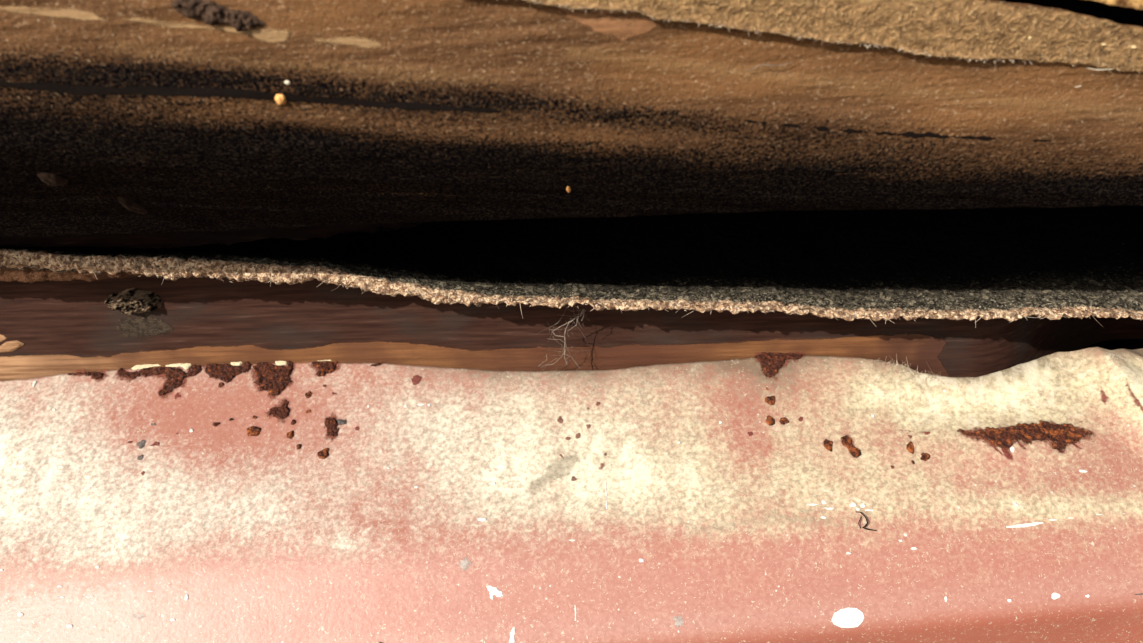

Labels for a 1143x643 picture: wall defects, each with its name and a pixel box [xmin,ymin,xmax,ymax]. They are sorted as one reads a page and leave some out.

corrosion [67,361,340,449]
corrosion [755,352,805,425]
corrosion [127,440,160,475]
corrosion [317,414,360,459]
corrosion [957,420,1094,460]